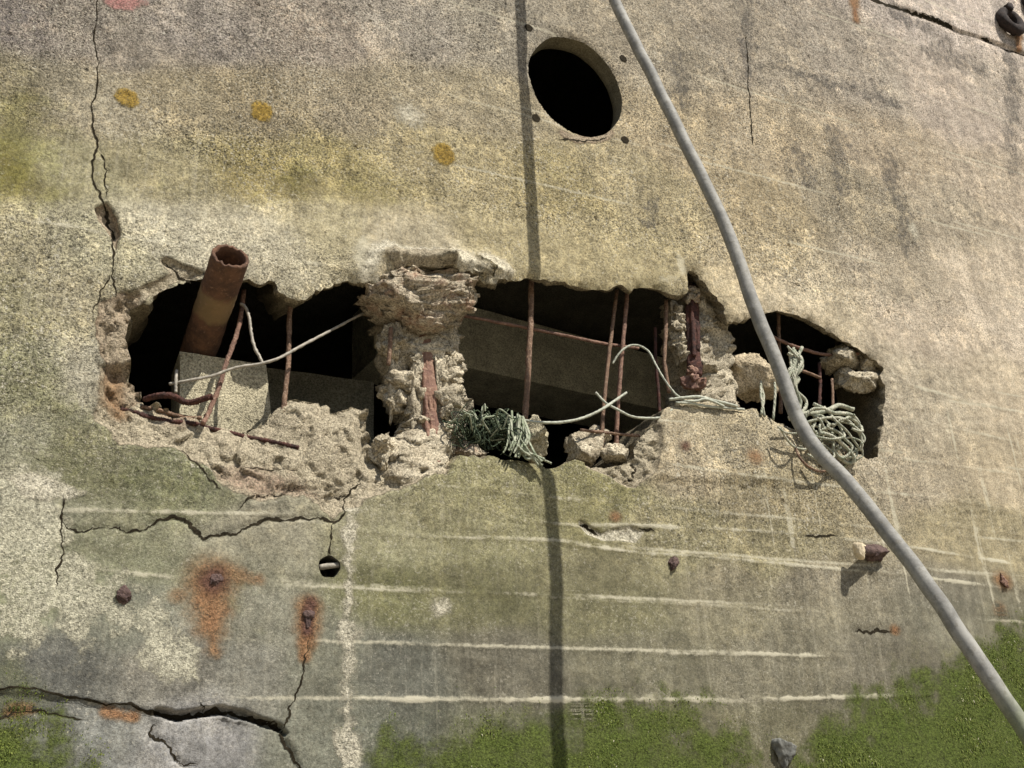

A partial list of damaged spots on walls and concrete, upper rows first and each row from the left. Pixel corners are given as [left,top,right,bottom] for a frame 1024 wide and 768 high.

crack [871,0,954,31]
crack [91,0,117,313]
spalling [93,256,424,519]
spalling [586,420,662,488]
crack [55,450,361,588]
spalling [579,522,643,543]
corrosion [175,561,261,656]
corrosion [297,597,320,661]
crack [0,640,309,768]